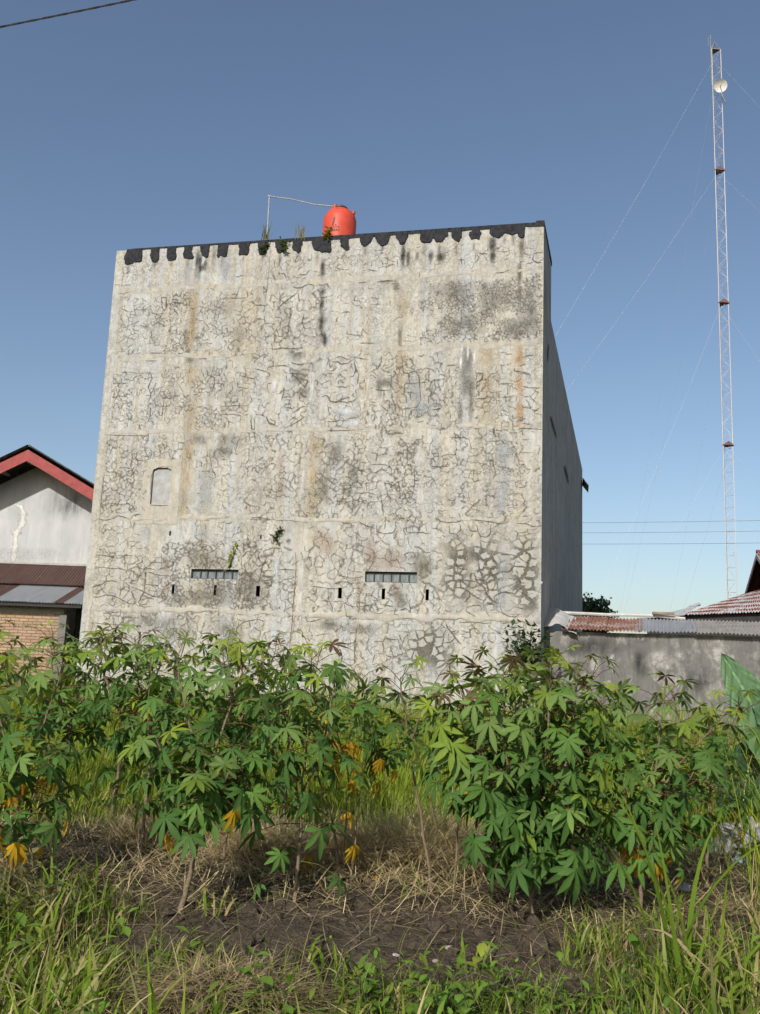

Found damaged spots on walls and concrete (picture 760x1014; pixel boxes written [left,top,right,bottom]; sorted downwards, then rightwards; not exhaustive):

crack [11,503,27,561]
crack [90,240,569,687]